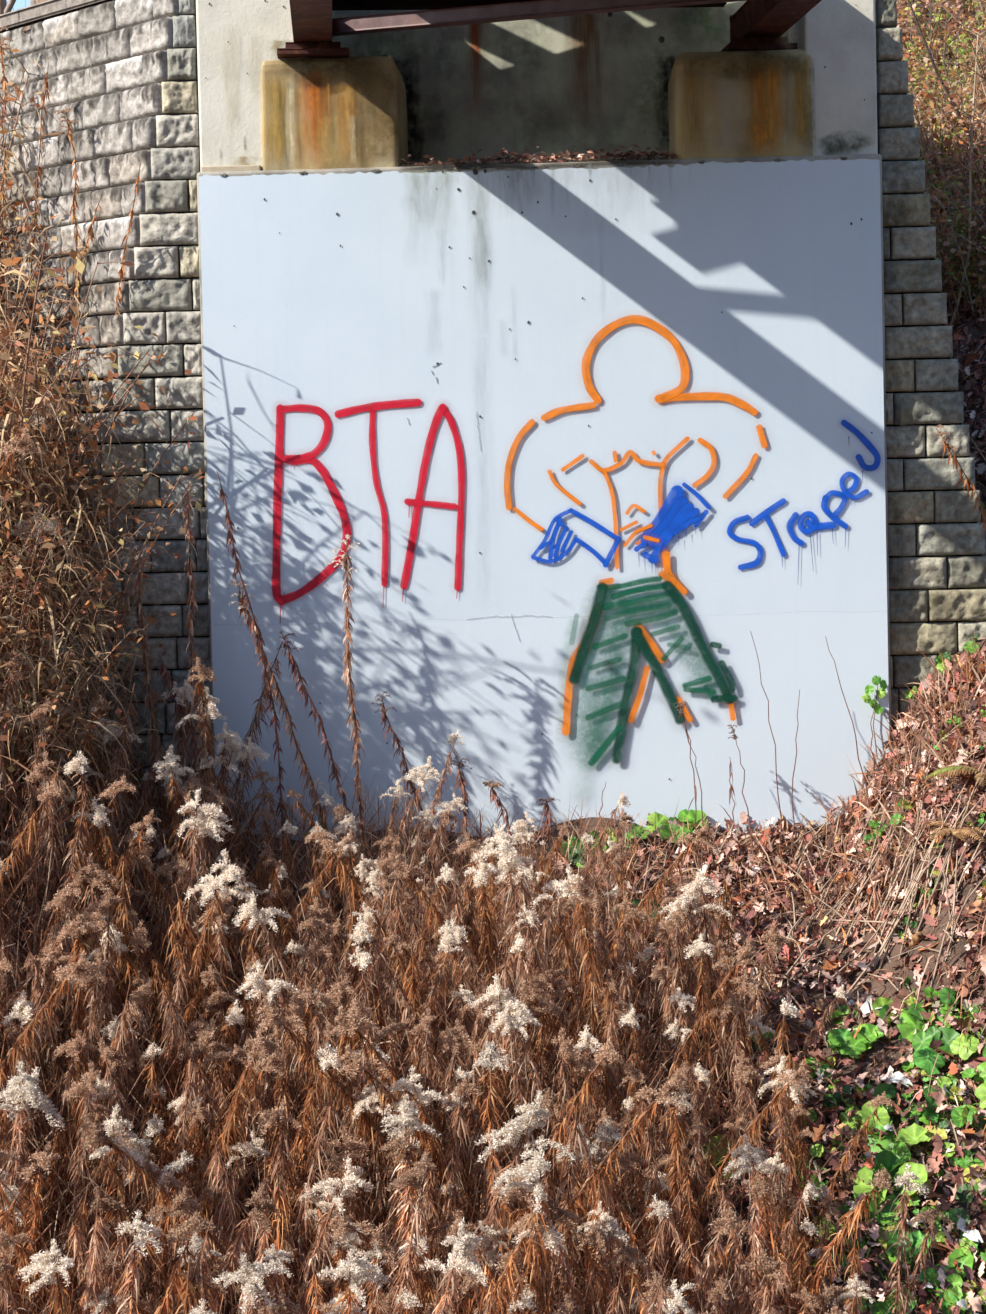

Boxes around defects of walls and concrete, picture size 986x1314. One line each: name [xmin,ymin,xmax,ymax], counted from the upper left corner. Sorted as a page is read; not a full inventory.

rust [269,73,354,160]